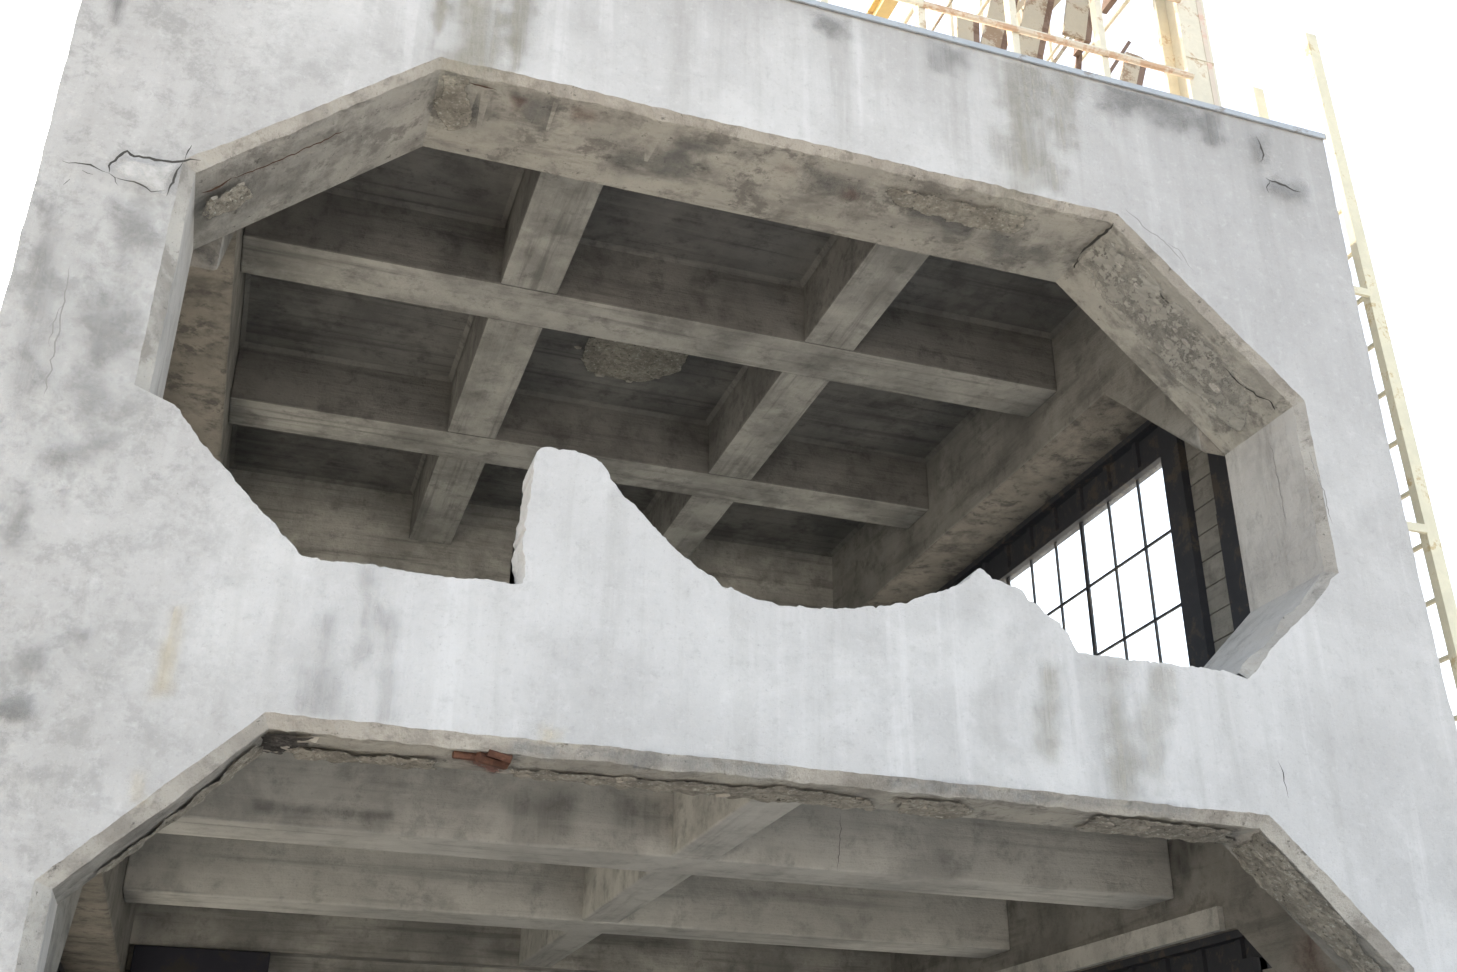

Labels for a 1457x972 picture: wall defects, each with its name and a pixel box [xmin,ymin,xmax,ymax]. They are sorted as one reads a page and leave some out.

crack [63,131,343,194]
crack [1256,137,1299,192]
spalling [203,182,253,220]
crack [44,267,70,394]
spalling [574,337,688,383]
peeling [1079,238,1250,431]
rust [452,749,513,773]
spalling [1075,815,1382,972]